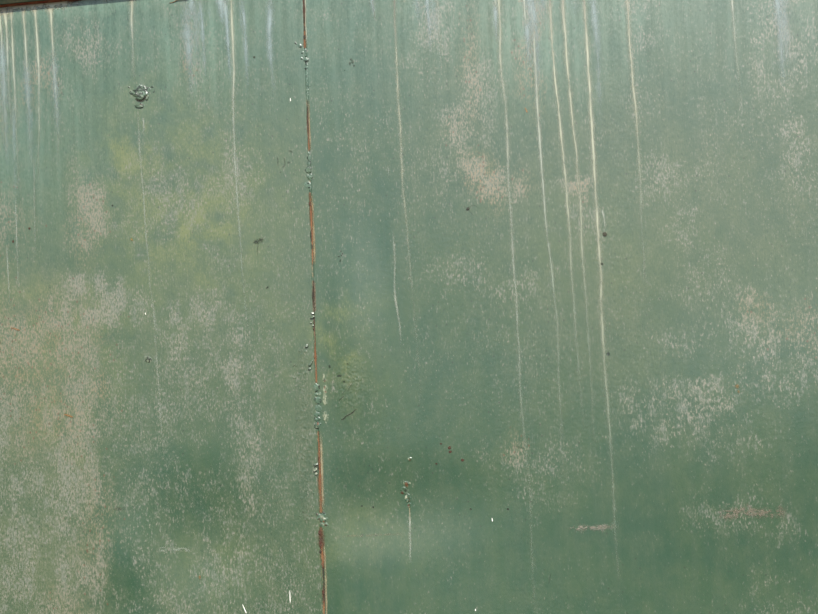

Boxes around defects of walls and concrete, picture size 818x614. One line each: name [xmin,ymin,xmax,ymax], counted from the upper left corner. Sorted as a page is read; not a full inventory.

leakage [0,1,78,141]
leakage [494,0,505,98]
leakage [523,0,547,229]
leakage [549,0,578,327]
leakage [583,0,605,302]
leakage [626,0,638,136]
leakage [601,312,611,439]
corrosion [318,527,327,614]